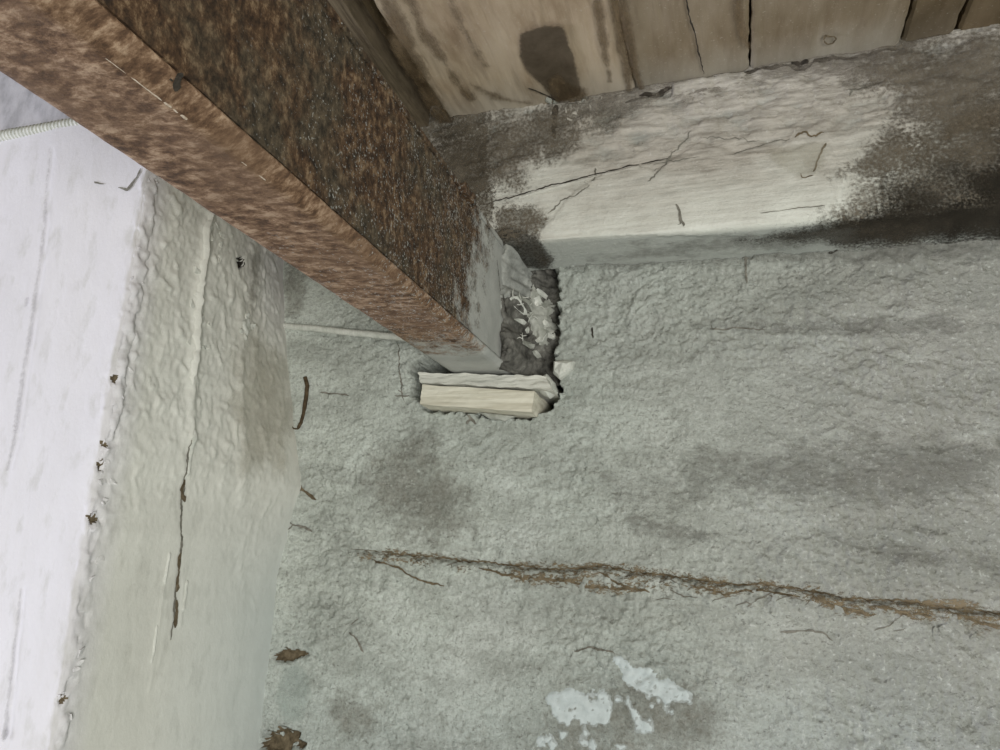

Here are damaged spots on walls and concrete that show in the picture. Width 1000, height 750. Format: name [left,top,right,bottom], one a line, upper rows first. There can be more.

water stain [520,26,588,103]
crack [493,131,826,213]
crack [676,204,685,226]
water stain [739,131,1000,248]
spalling [499,244,561,386]
crack [150,430,197,665]
crack [349,548,1000,641]
peeling [536,656,693,750]